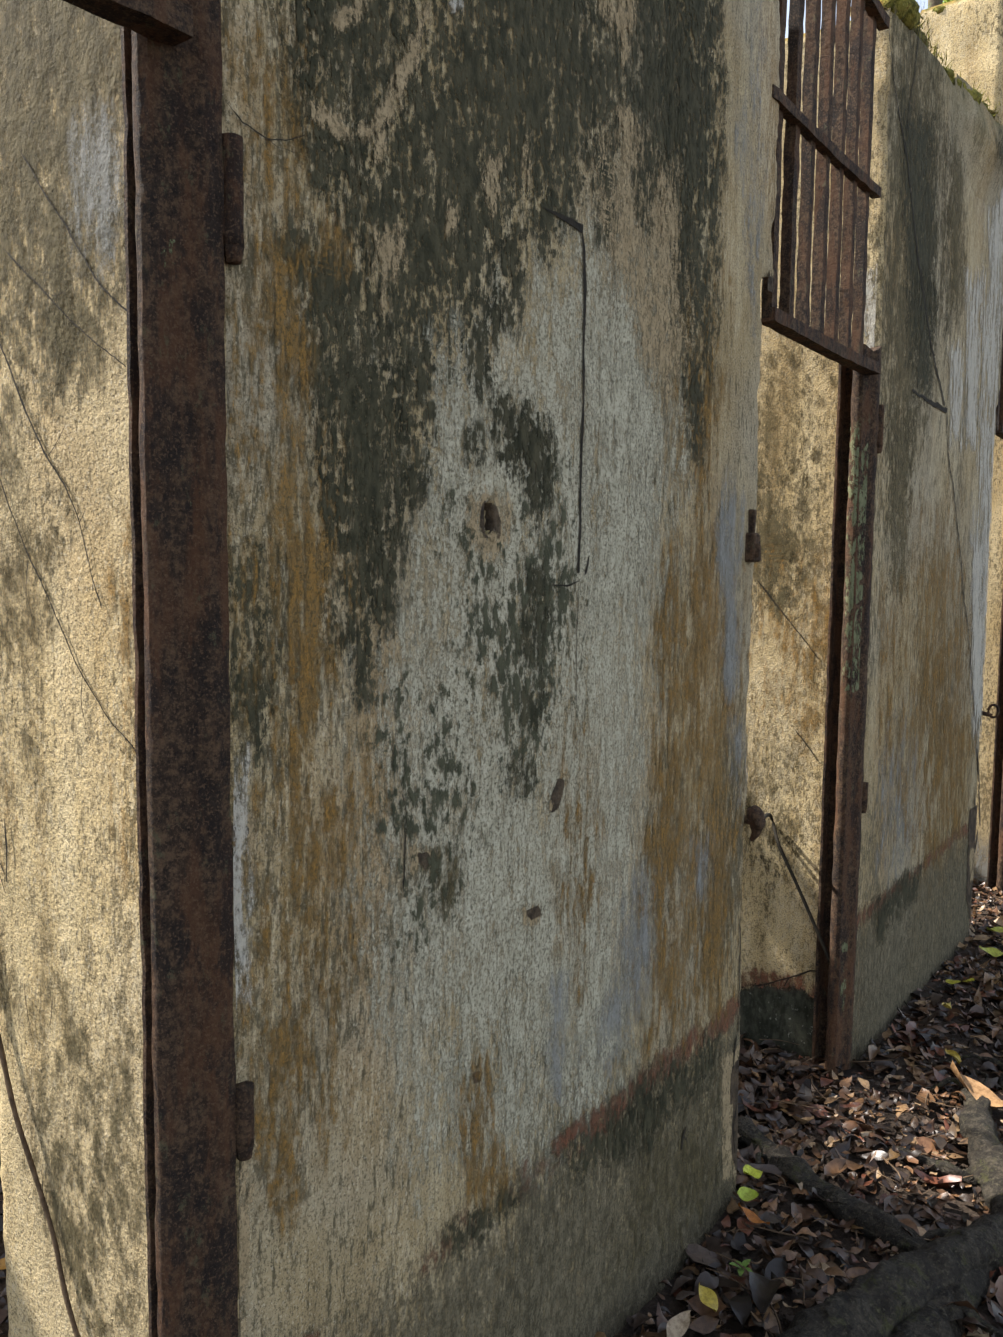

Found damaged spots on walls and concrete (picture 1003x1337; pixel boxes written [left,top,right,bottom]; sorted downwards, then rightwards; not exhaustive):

damp [2,693,48,825]
damp [0,0,126,677]
damp [107,512,132,709]
damp [225,0,830,1278]
damp [870,87,1003,946]
mould [0,912,147,1337]